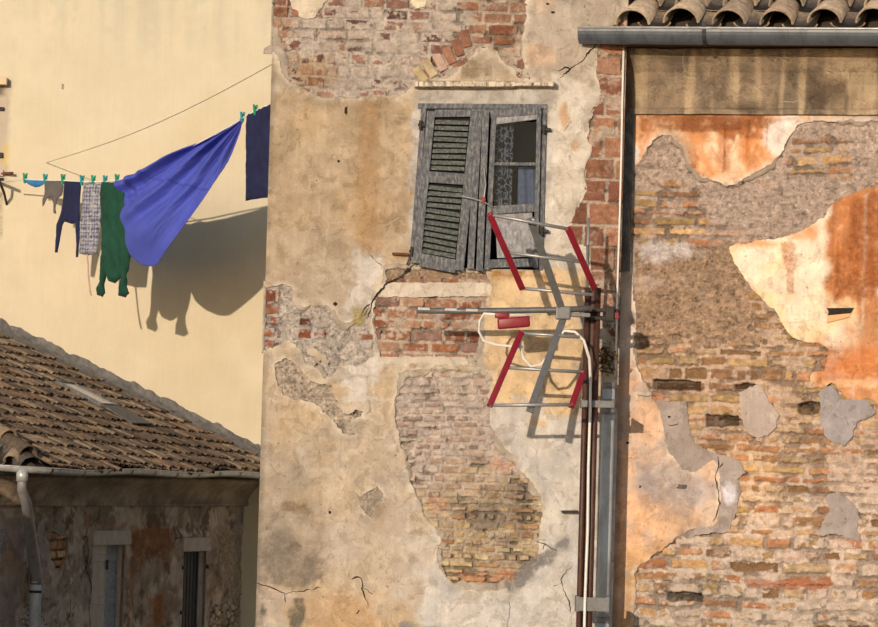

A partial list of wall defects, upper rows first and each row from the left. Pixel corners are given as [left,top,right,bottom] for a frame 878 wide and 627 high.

flaking render [263,0,530,114]
crack [559,44,597,78]
crack [361,255,416,315]
flaking render [560,44,878,627]
flaking render [262,263,543,592]
flaking render [208,523,243,627]
crack [255,582,320,603]
crack [352,576,372,614]